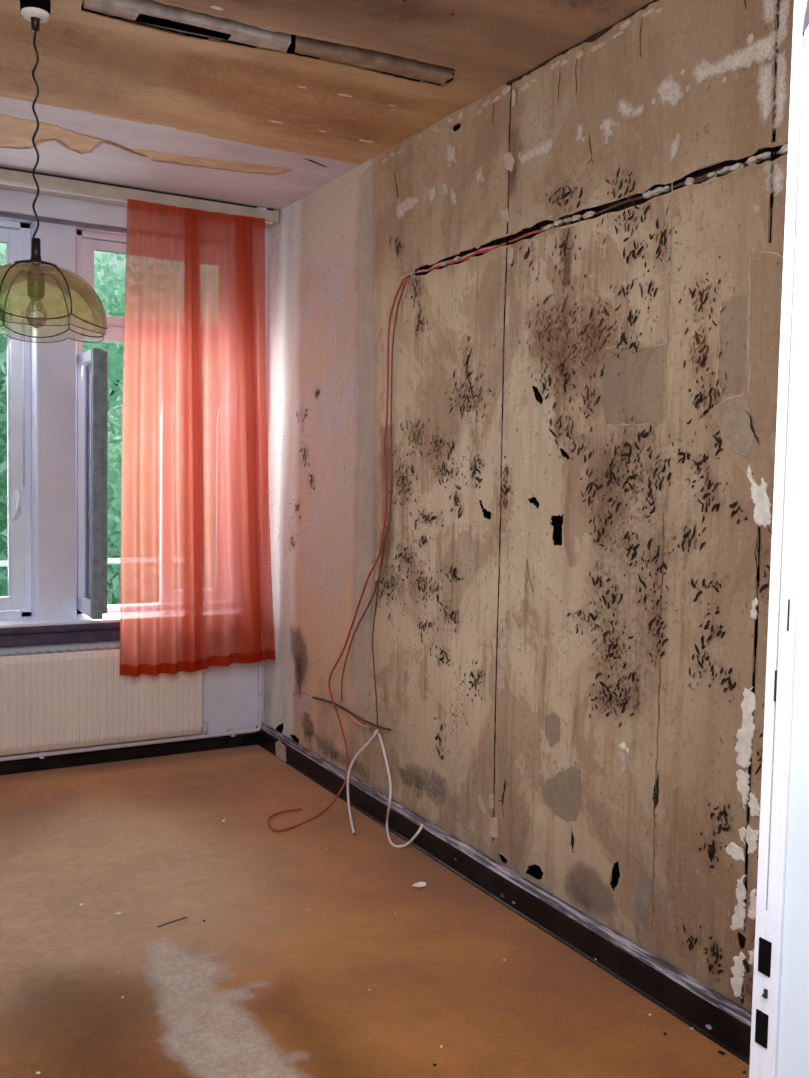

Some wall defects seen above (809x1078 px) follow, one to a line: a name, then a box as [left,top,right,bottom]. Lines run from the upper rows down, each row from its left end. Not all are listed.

crack [743,0,790,243]
crack [370,0,666,840]
spalling [526,493,566,550]
flaking render [531,363,655,542]
water stain [365,708,397,754]
crack [726,411,772,1004]
spalling [609,857,623,895]